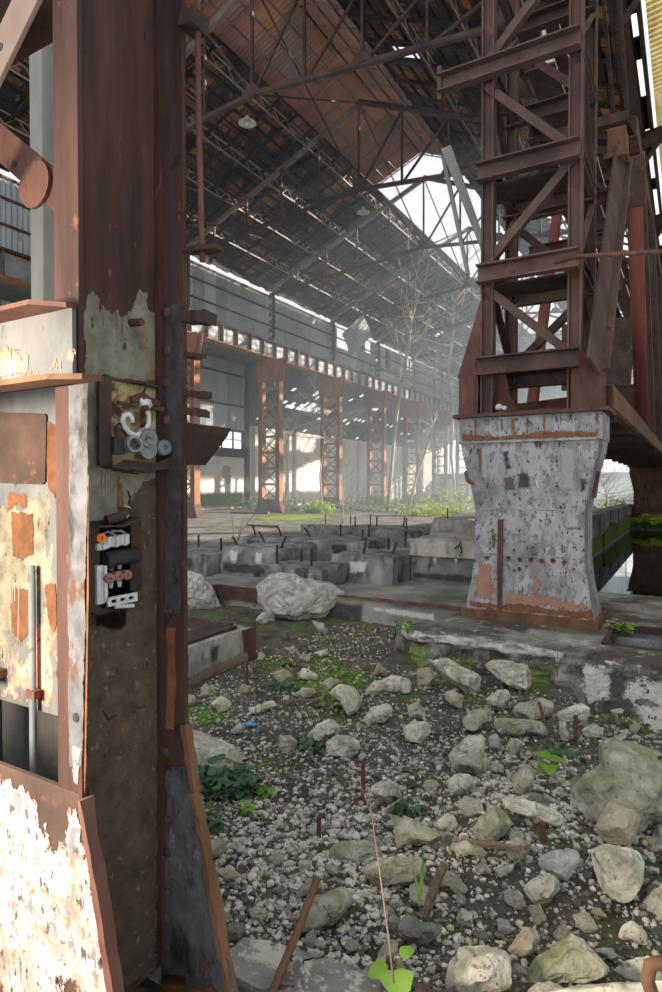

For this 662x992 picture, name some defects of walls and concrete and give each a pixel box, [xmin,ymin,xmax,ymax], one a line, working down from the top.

rust [462,414,598,471]
rust [7,493,34,561]
peeling [0,289,155,784]
peeling [473,561,496,600]
rust [470,601,593,619]
rust [506,556,567,572]
peeling [504,578,587,612]
peeling [0,776,106,992]